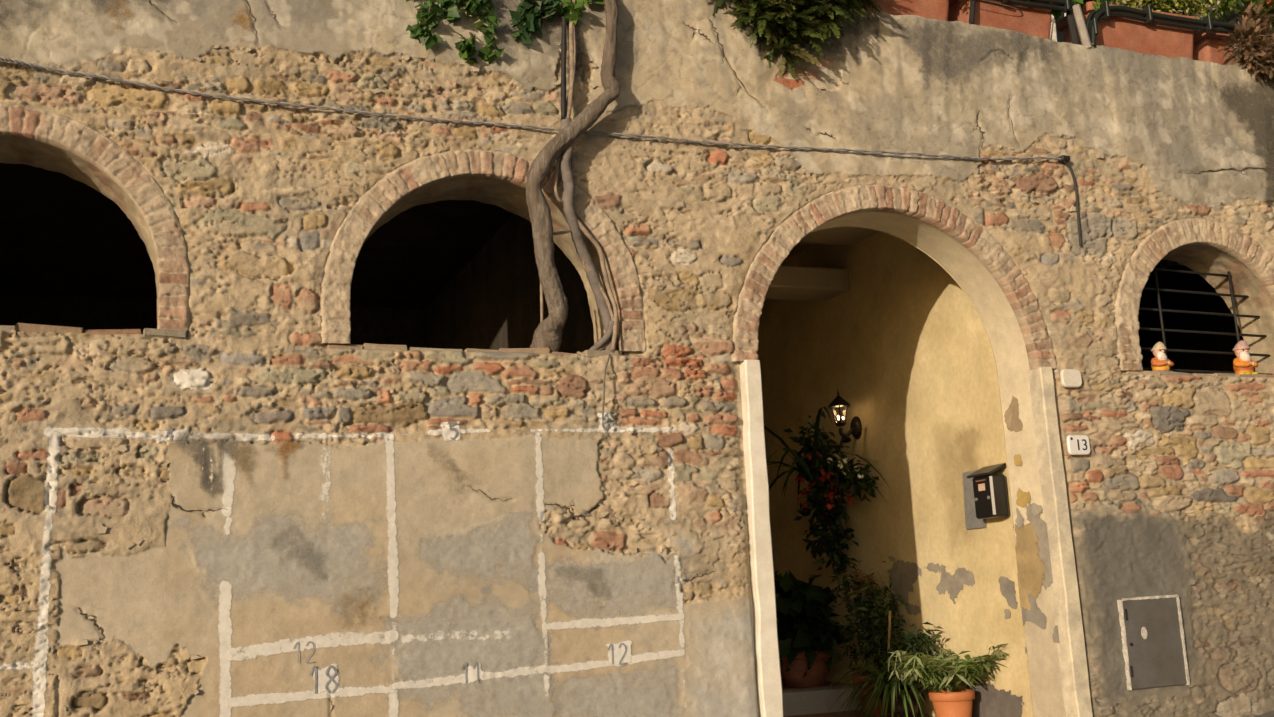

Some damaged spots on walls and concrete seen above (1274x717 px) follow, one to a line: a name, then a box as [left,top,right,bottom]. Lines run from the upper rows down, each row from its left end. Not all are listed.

crack [245,0,285,45]
spalling [107,44,491,95]
spalling [554,42,598,102]
crack [683,19,766,108]
spalling [777,52,848,91]
crack [1180,167,1266,175]
peeling [1004,396,1023,432]
water stain [176,436,248,494]
peeling [887,556,975,615]
peeling [999,488,1060,643]